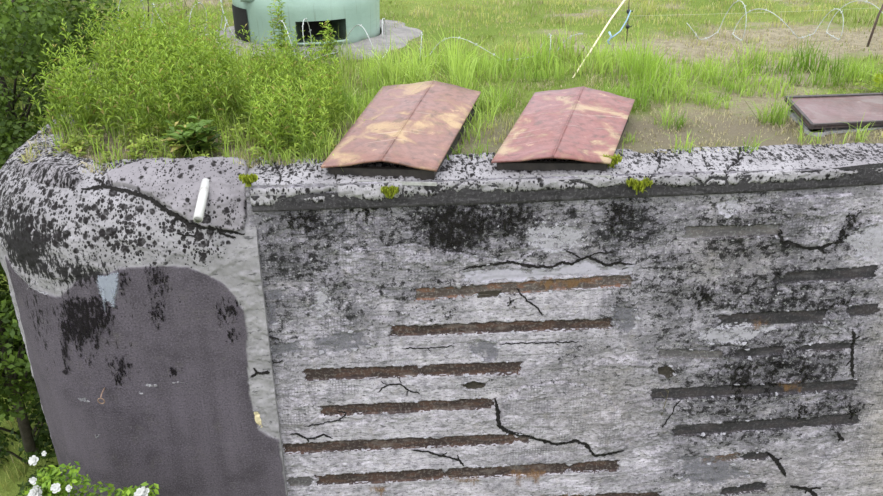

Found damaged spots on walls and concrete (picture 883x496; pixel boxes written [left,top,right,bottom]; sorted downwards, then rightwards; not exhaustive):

crack [81,178,261,265]
crack [462,249,634,270]
leakage [58,273,125,375]
crack [516,288,542,315]
crack [251,336,282,409]
crack [494,398,624,457]